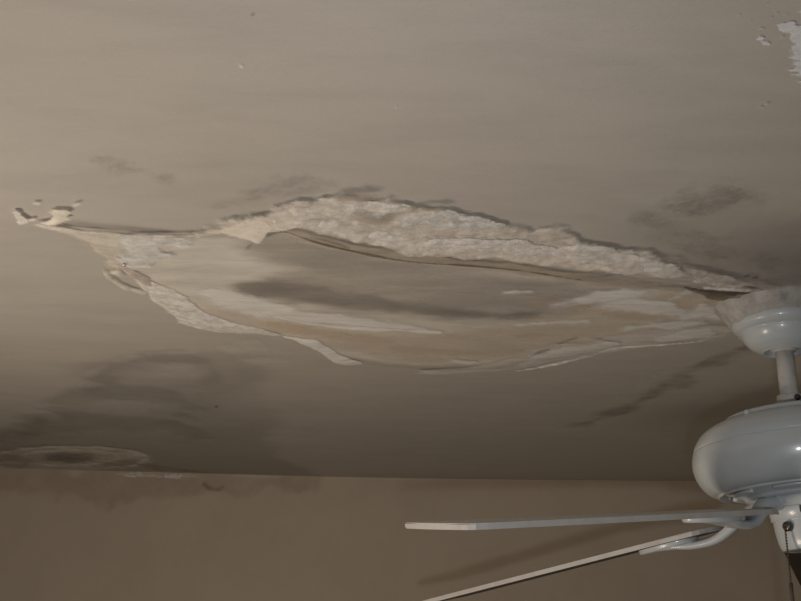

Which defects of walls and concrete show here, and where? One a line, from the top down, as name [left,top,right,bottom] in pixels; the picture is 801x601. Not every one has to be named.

peeling [12,195,772,292]
water stain [104,265,442,365]
water stain [0,446,148,470]